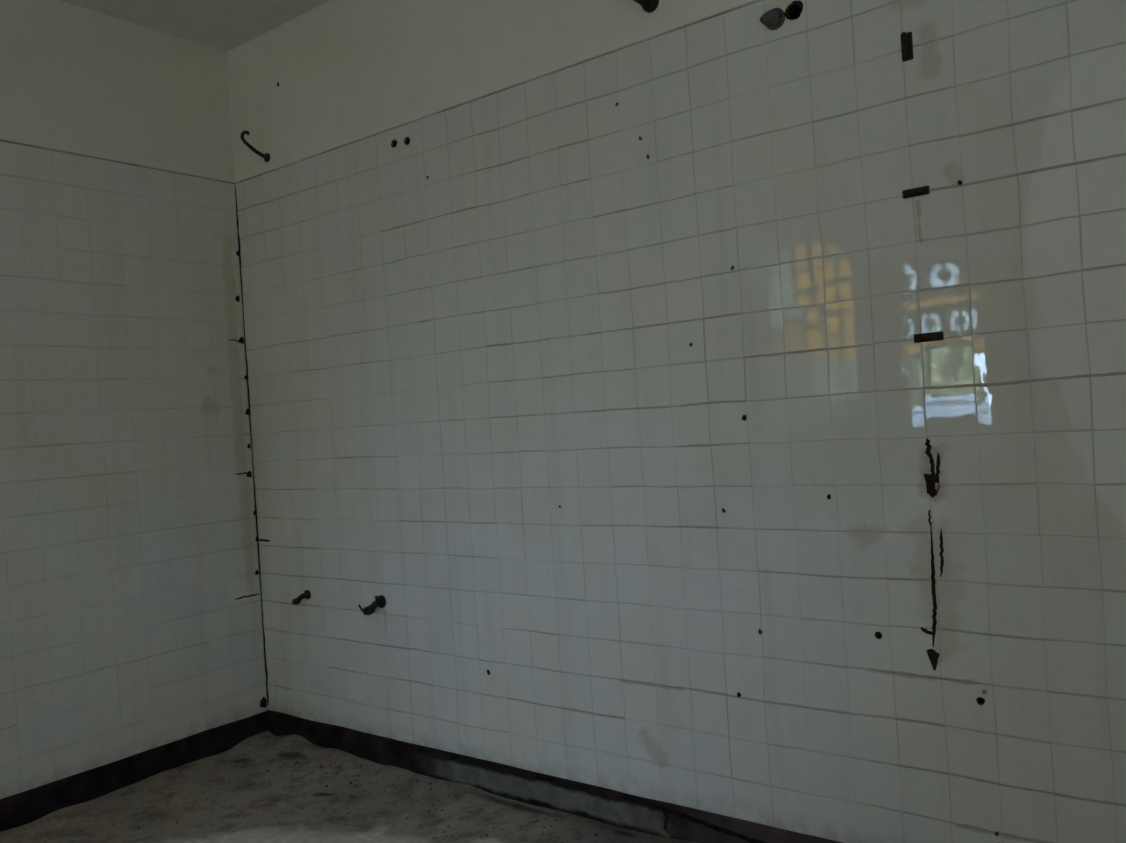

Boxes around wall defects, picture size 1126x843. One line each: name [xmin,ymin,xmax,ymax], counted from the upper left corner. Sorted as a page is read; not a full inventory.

corrosion [829,504,990,696]